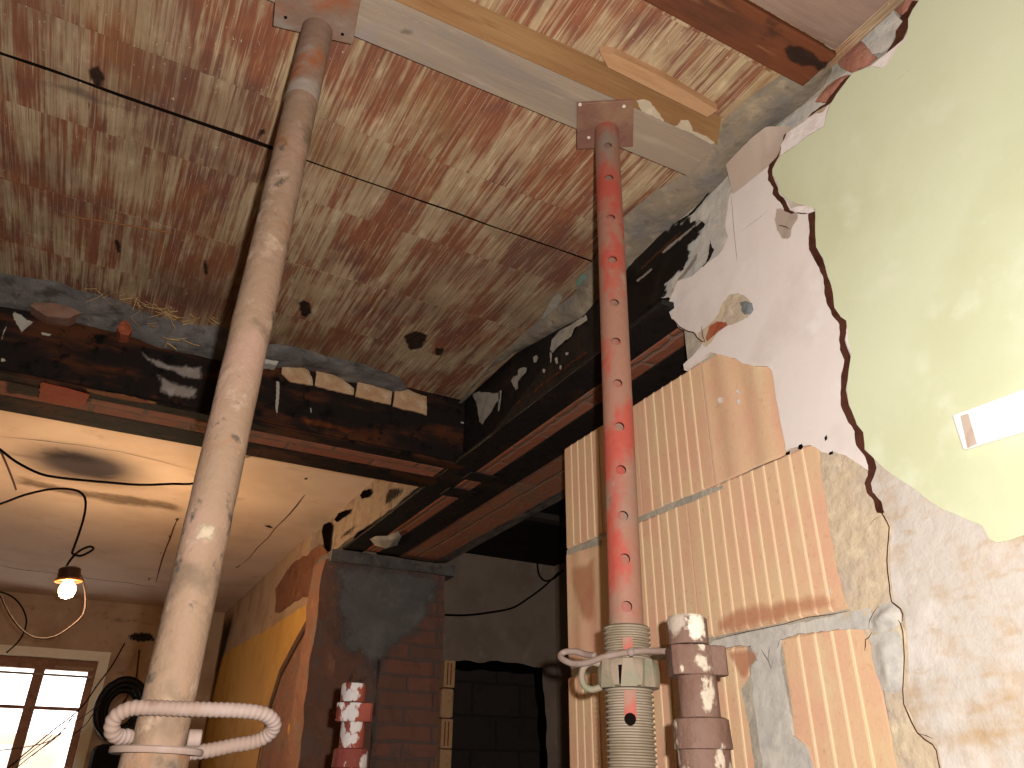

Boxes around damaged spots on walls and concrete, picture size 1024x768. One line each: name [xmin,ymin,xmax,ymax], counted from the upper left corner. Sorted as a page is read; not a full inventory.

flaking render [815,41,878,103]
flaking render [673,293,754,347]
crack [714,1,940,768]
crack [236,478,307,568]
flaking render [275,479,419,613]